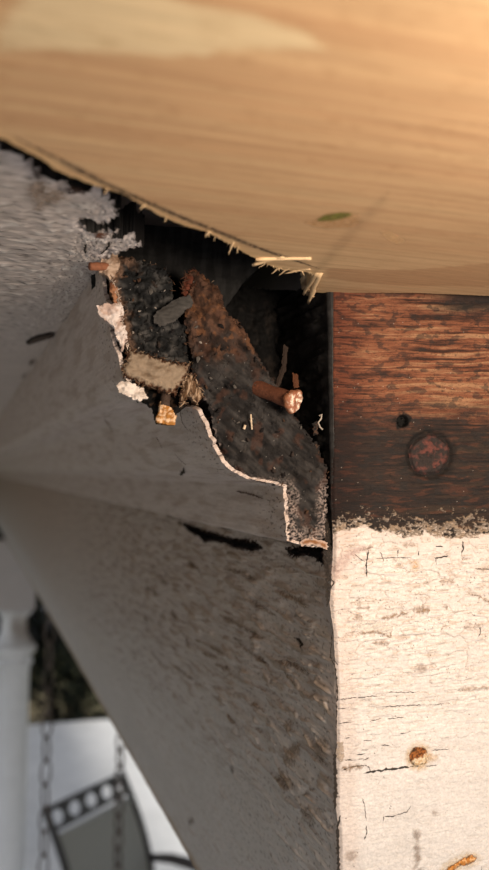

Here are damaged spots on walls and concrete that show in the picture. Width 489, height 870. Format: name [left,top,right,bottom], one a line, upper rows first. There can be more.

peeling [96,259,130,353]
peeling [116,380,148,402]
crack [355,541,489,575]
crack [322,519,448,870]
corrosion [409,747,428,767]
corrosion [447,855,477,870]